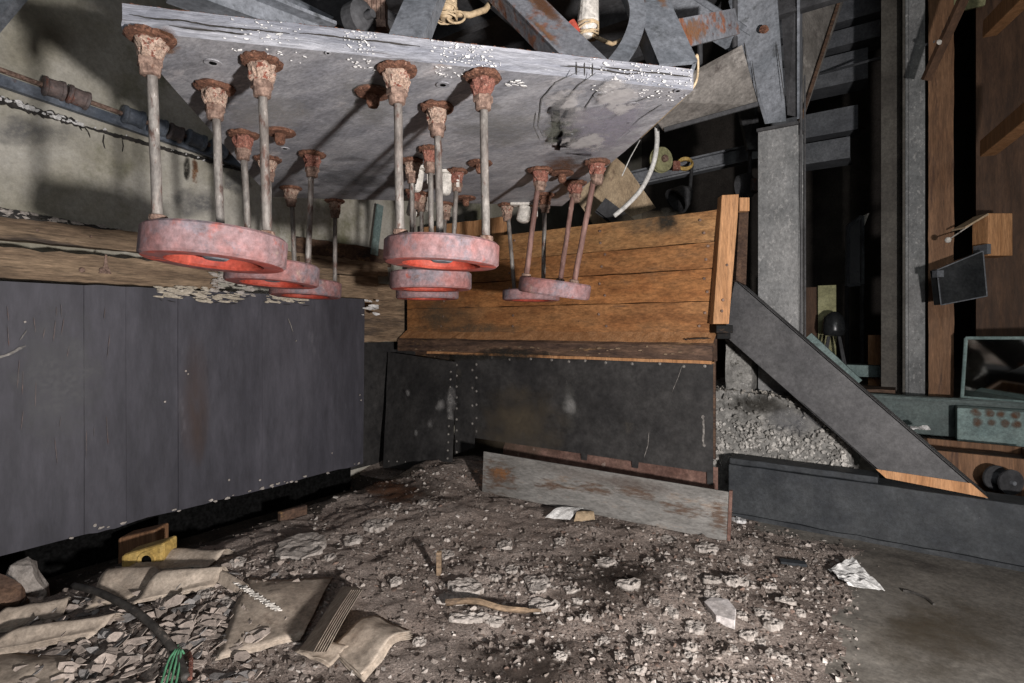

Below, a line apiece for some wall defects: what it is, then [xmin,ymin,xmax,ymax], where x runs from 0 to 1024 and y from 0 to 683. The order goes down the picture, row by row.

water stain [534,71,662,151]
rust [972,409,1021,427]